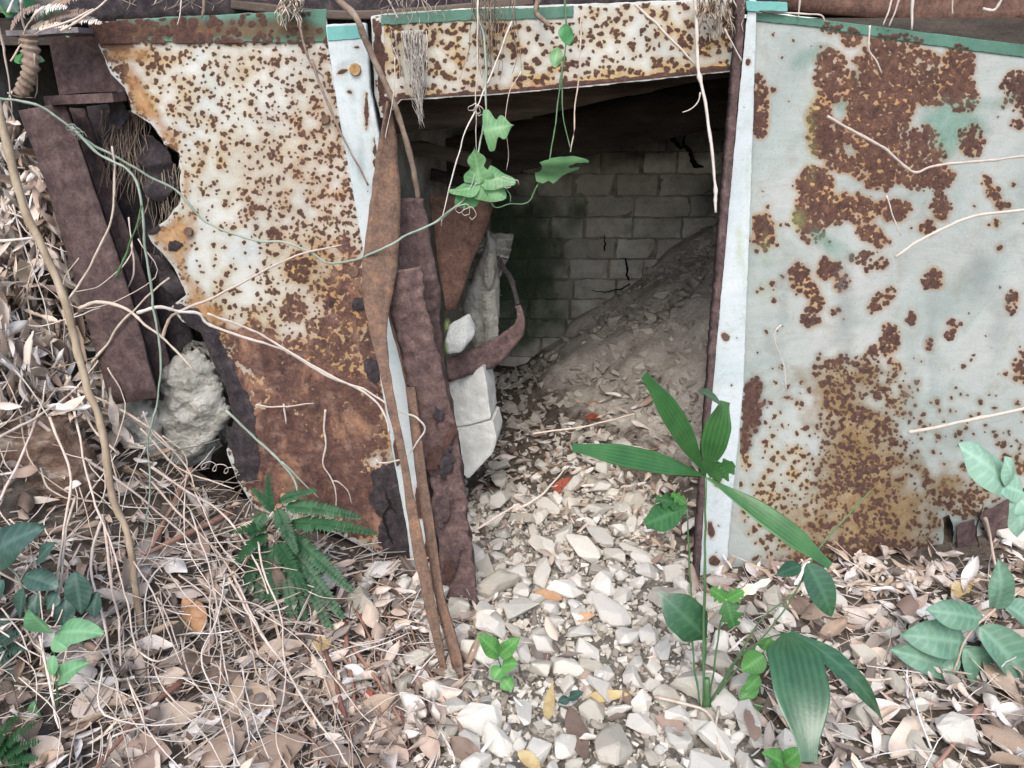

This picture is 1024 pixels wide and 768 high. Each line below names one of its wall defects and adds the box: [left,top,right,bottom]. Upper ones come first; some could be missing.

corrosion [744,59,776,138]
corrosion [998,70,1024,130]
crack [670,135,704,168]
corrosion [749,22,986,328]
corrosion [981,175,1016,227]
crack [592,235,630,293]
corrosion [999,285,1018,316]
corrosion [88,2,734,679]